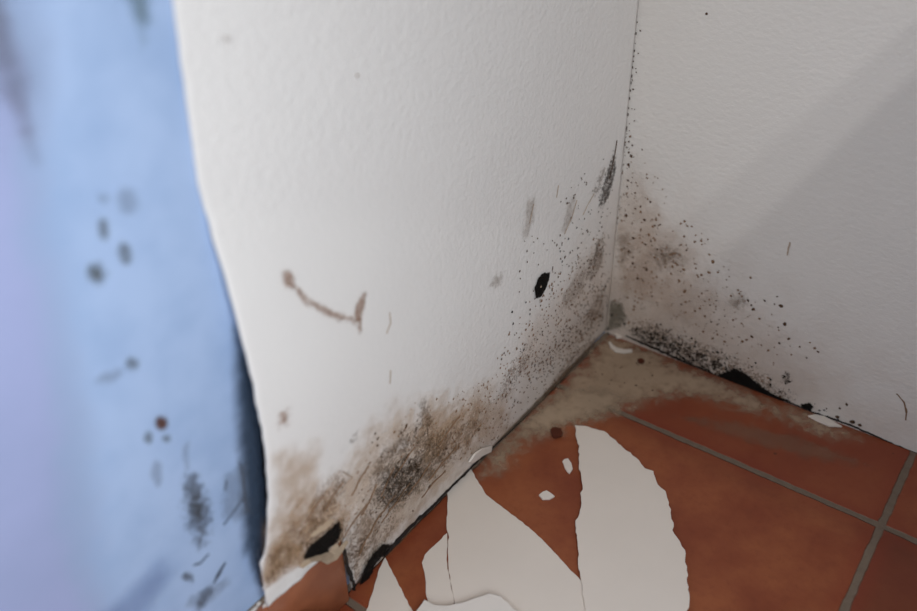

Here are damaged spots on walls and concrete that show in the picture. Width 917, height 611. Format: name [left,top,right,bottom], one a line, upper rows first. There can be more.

leakage [296,21,916,591]
peeling [309,518,334,537]
peeling [299,540,349,568]